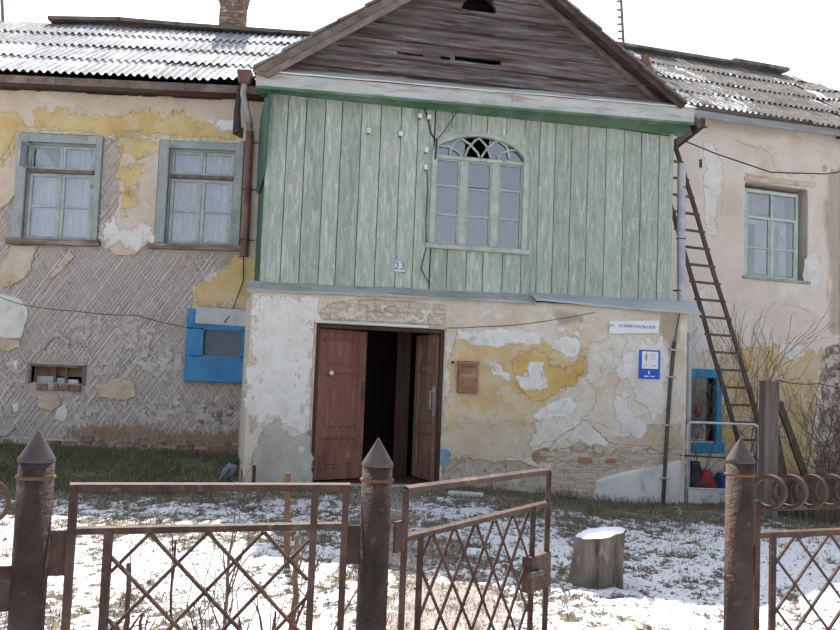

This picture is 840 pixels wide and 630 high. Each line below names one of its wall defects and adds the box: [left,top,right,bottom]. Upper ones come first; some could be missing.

peeling [0,106,246,217]
peeling [699,141,725,237]
peeling [191,251,256,309]
flaking render [319,300,445,326]
peeling [440,326,687,500]
crack [534,335,674,455]
peeling [719,299,840,479]